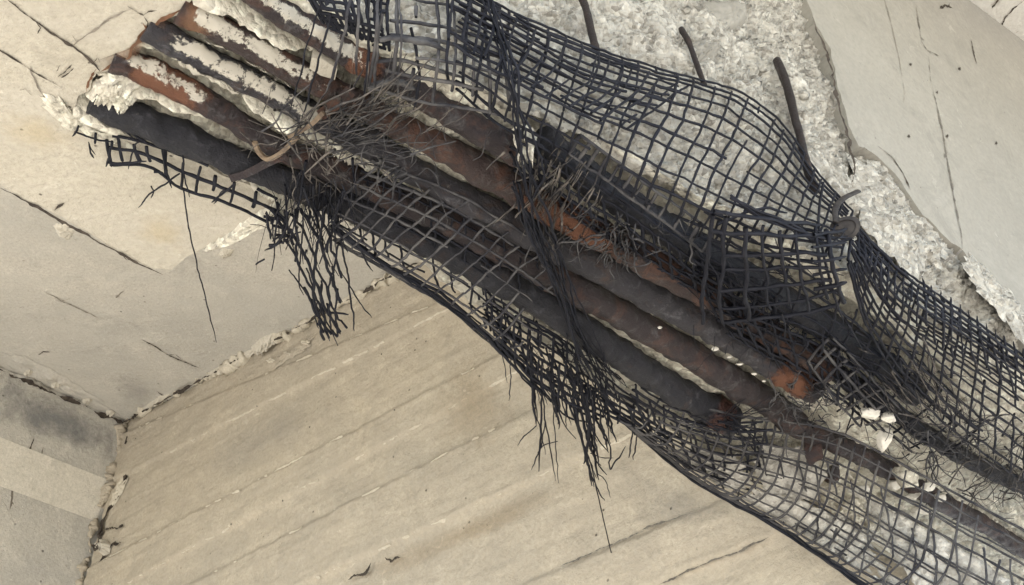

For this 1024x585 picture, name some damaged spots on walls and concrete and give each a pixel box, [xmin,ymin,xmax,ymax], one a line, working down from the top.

crack [0,0,180,97]
spalling [40,71,267,156]
rust [128,41,212,107]
rust [185,5,209,32]
spalling [192,0,313,63]
crack [1,188,163,275]
rust [520,188,612,251]
spalling [288,0,1024,491]
crack [0,339,239,444]
rust [771,357,816,399]
spalling [650,313,1024,540]
crack [97,474,127,562]